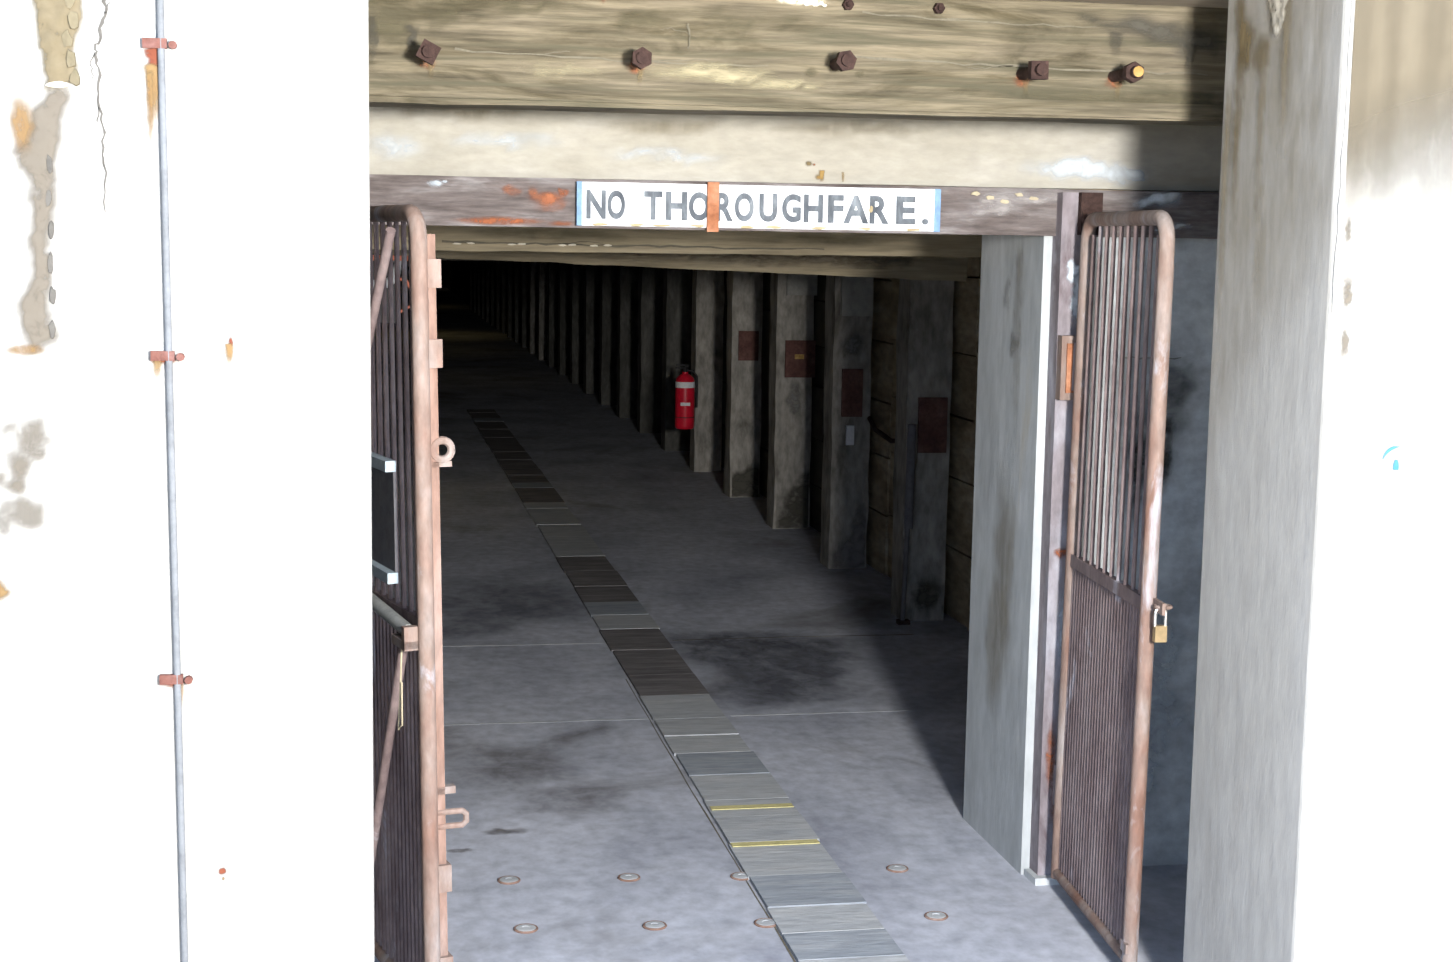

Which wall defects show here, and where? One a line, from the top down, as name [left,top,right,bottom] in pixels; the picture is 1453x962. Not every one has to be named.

leakage [1347,0,1453,158]
peeling [10,0,82,354]
rust [530,189,568,206]
leakage [1167,376,1188,405]
leakage [1132,438,1146,505]
leakage [1163,420,1171,477]
leakage [686,635,841,702]
leakage [1147,619,1167,780]